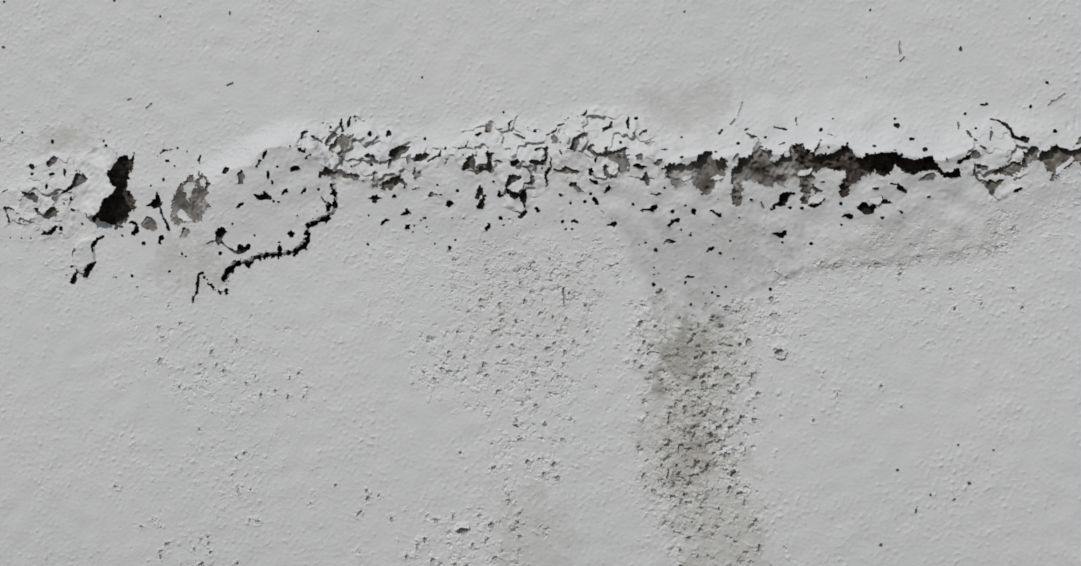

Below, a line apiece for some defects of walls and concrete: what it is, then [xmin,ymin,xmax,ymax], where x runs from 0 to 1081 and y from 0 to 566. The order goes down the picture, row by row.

peeling [965,111,1081,204]
peeling [1,146,137,288]
spalling [141,216,158,232]
crack [192,213,333,303]
peeling [170,105,821,309]